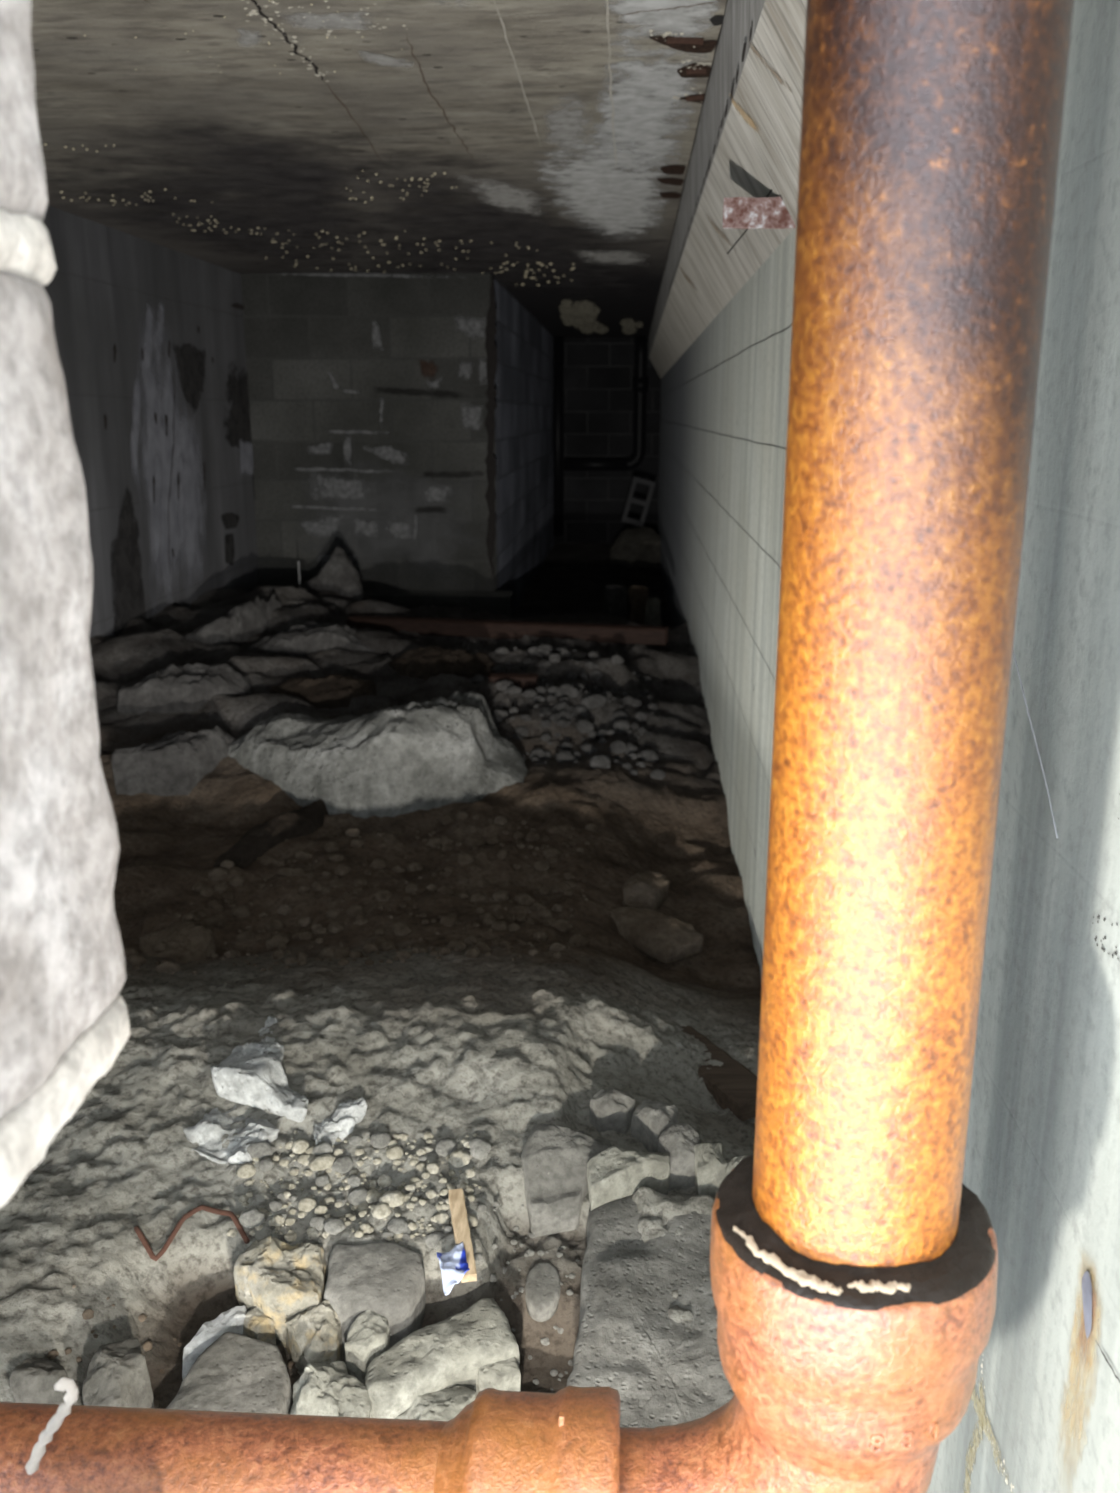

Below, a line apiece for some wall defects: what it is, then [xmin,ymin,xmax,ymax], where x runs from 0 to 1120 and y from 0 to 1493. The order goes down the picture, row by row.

crack [242,0,381,160]
water stain [91,0,717,292]
water stain [111,304,255,637]